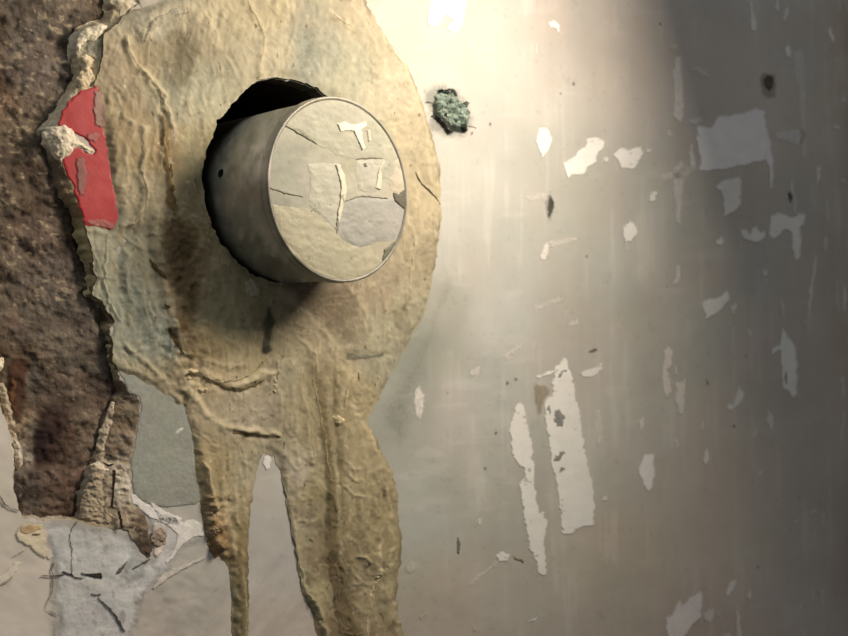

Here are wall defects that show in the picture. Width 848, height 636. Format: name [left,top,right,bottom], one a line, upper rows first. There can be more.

peeling [428,0,467,33]
peeling [663,45,802,222]
peeling [740,181,806,260]
spalling [0,0,205,636]
peeling [771,328,798,398]
peeling [509,403,548,575]
peeling [537,358,607,534]
crack [42,521,151,631]
peeling [496,552,524,562]
peeling [666,591,721,636]